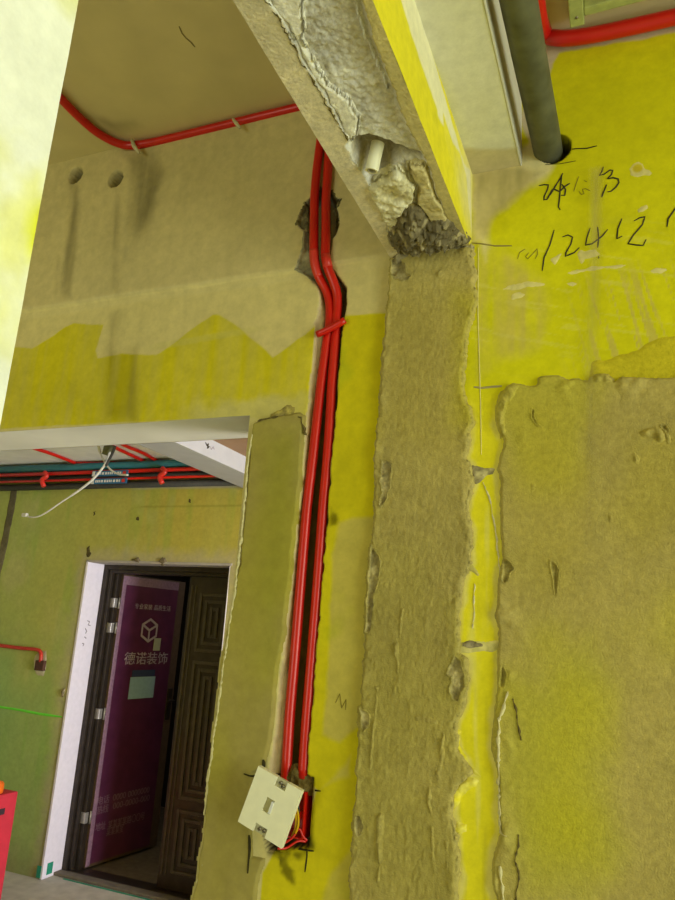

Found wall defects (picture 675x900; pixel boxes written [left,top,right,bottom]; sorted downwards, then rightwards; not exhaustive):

spalling [265,0,474,281]
peeling [472,465,495,484]
flaking render [363,543,382,635]
flaking render [500,558,515,584]
spalling [549,559,560,597]